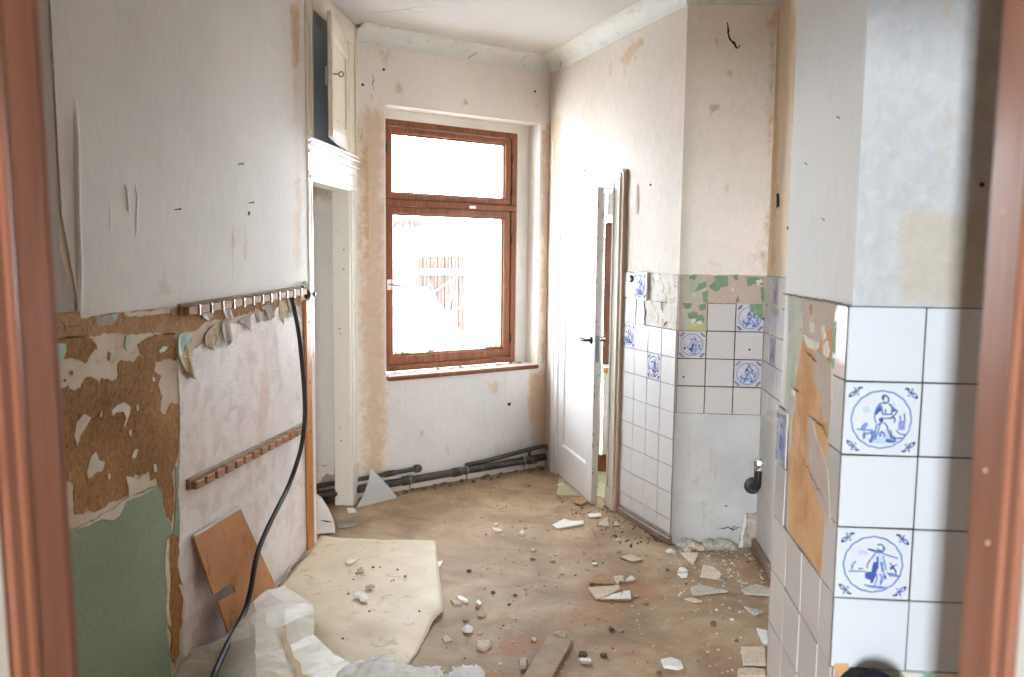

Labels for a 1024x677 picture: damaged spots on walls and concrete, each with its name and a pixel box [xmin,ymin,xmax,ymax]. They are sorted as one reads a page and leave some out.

peeling [58,296,301,663]